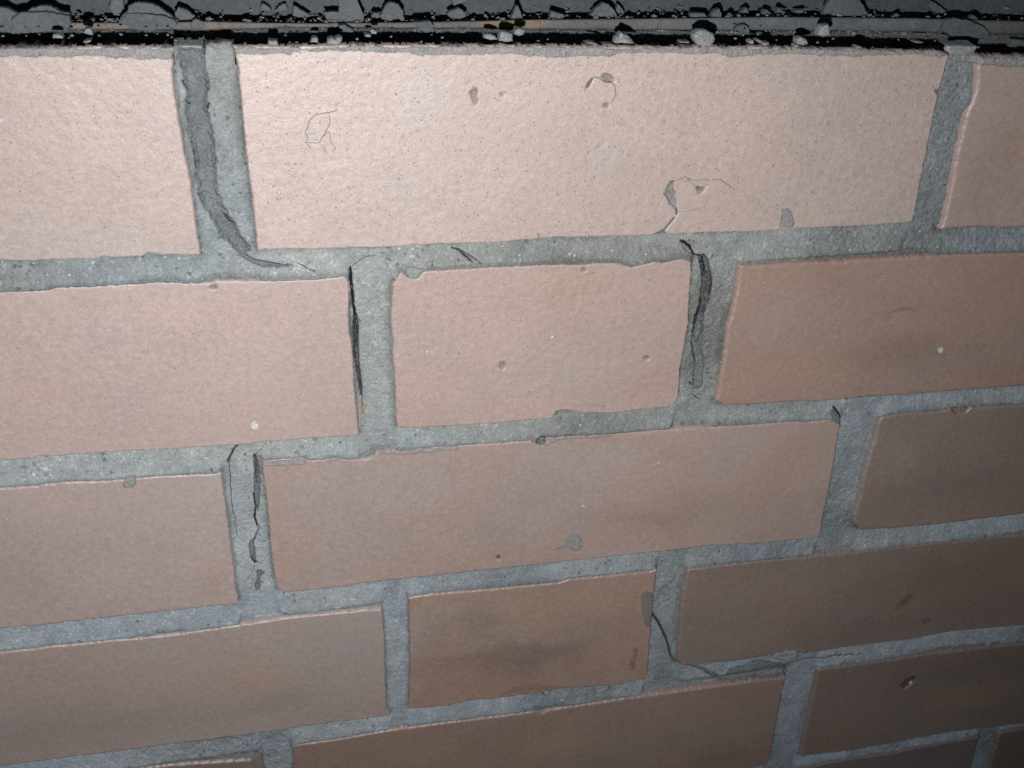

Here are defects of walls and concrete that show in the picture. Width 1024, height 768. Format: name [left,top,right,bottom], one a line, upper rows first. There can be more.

spalling [657,176,732,233]
crack [349,255,392,426]
crack [680,239,712,400]
crack [227,441,267,591]
crack [652,579,711,675]